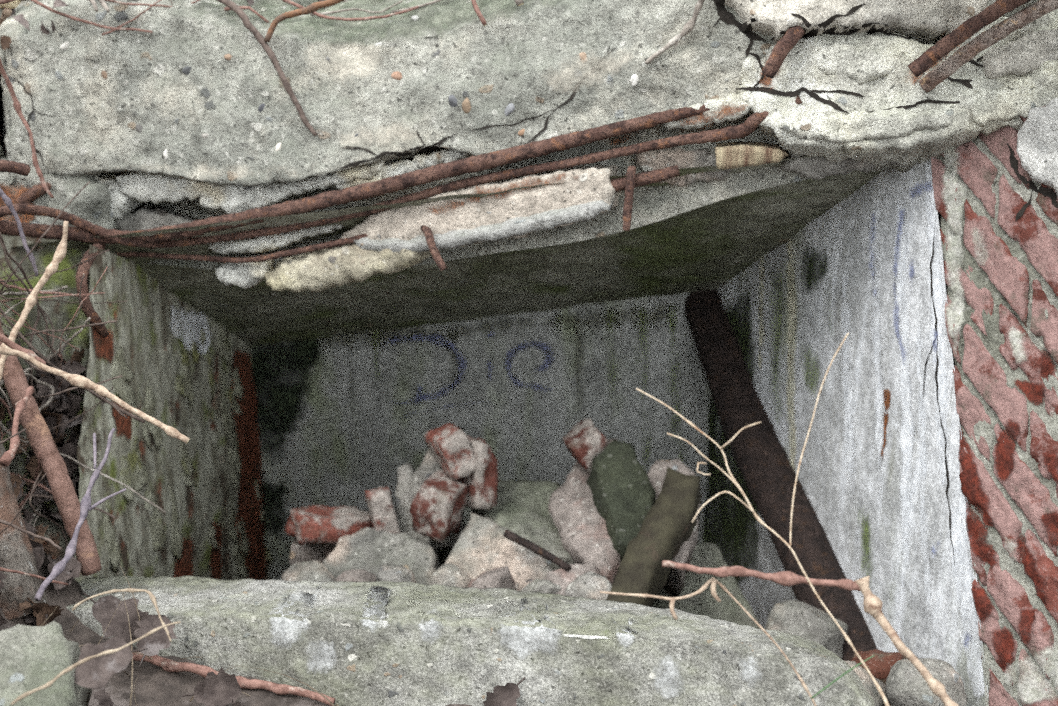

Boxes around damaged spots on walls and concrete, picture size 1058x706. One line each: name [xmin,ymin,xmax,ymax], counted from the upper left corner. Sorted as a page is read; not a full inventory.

spalling [334,47,379,77]
spalling [762,25,804,78]
crack [712,0,983,114]
spalling [777,0,1058,143]
crack [340,46,617,169]
corrosion [684,105,745,125]
corrosion [451,174,578,209]
spalling [780,154,901,180]
leakage [170,308,212,354]
spalling [0,91,769,580]
leakage [787,239,796,471]
corrosion [881,389,890,458]